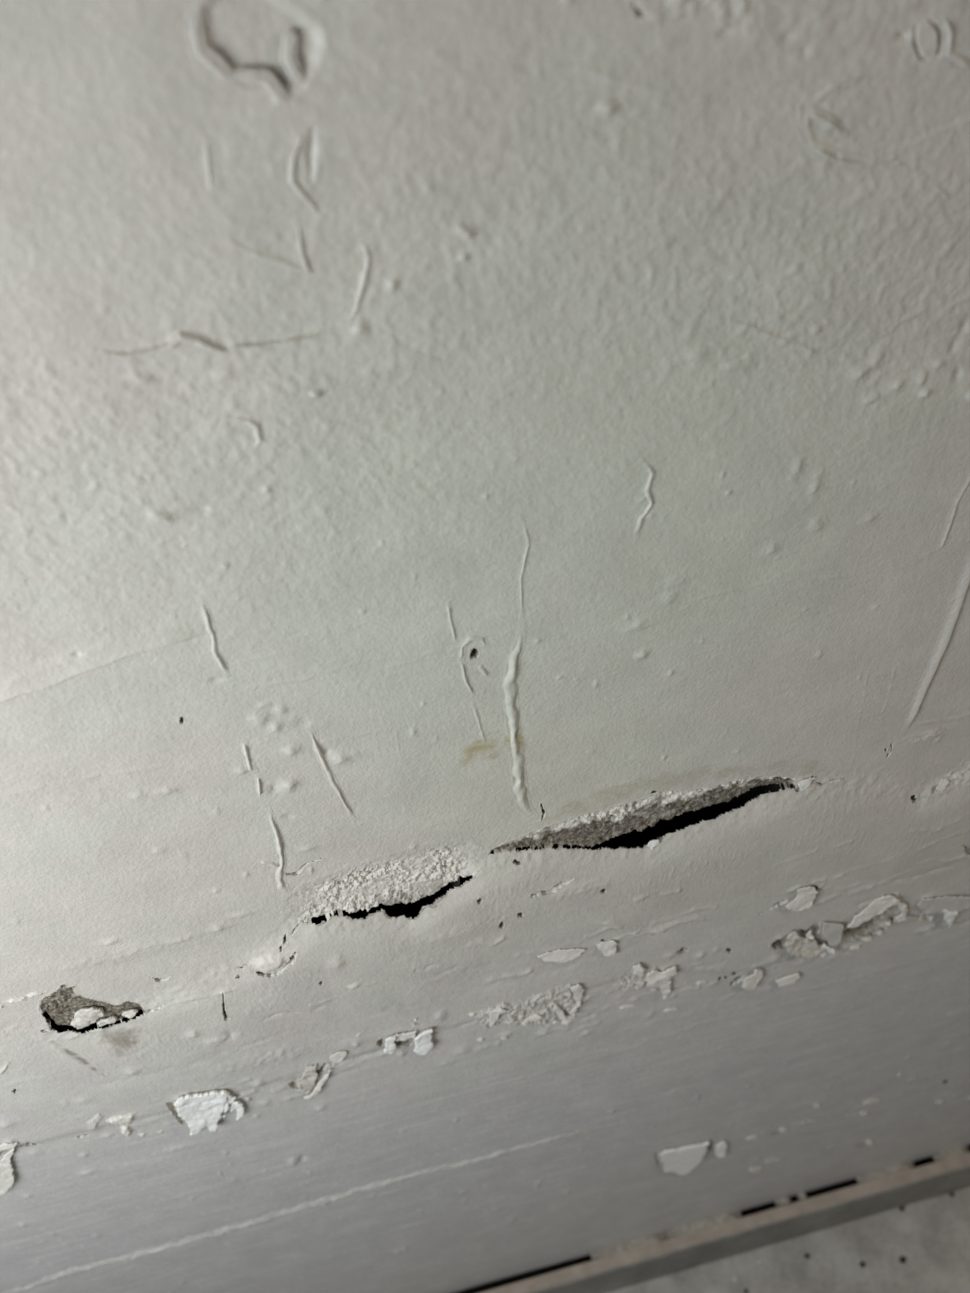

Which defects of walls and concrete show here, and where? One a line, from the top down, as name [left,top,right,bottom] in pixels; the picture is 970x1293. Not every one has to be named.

flaking render [914,754,970,804]
flaking render [278,773,848,926]
peeling [695,894,970,991]
flaking render [0,983,169,1035]
peeling [467,981,584,1042]
peeling [75,1090,244,1139]
peeling [0,1141,44,1197]
peeling [653,1140,727,1176]